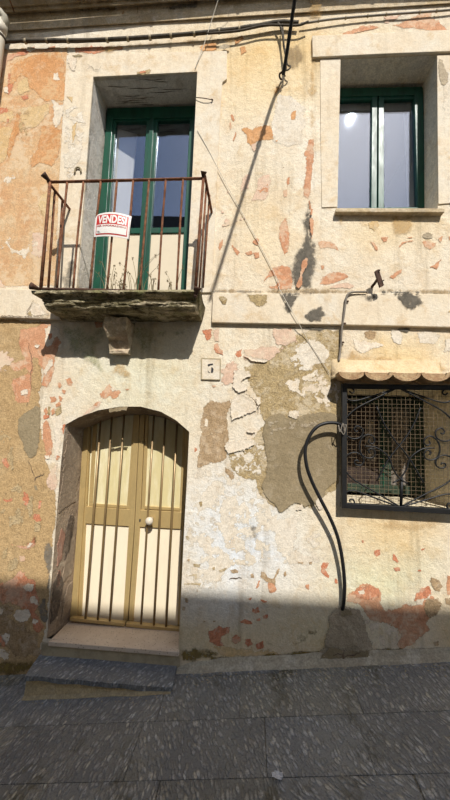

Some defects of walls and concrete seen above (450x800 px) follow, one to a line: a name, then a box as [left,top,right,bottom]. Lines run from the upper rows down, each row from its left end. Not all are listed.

peeling [201,35,247,55]
peeling [0,45,123,288]
damp [393,217,412,233]
damp [213,213,350,312]
peeling [353,330,383,353]
peeling [391,329,402,344]
peeling [417,331,450,353]
flaking render [0,302,82,675]
flaking render [184,328,344,624]
peeling [321,576,450,659]
peeling [203,620,279,657]